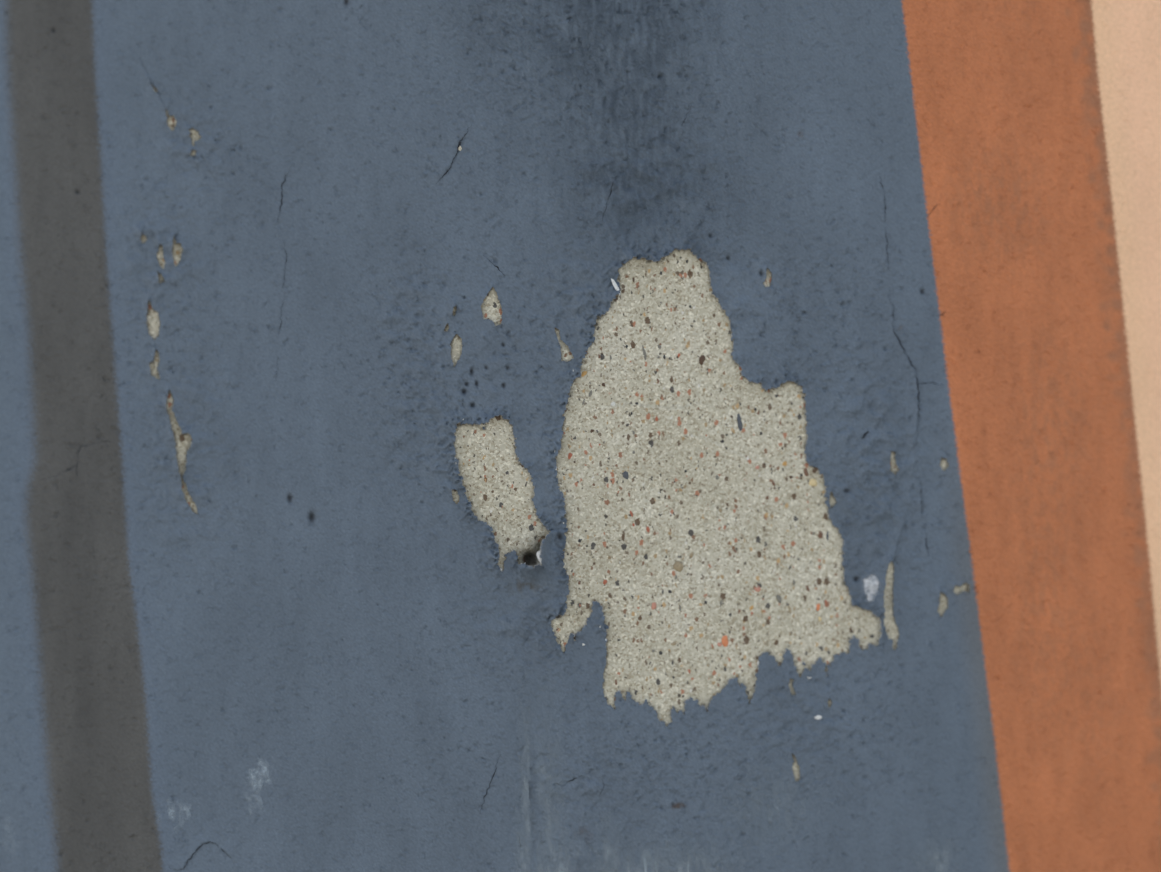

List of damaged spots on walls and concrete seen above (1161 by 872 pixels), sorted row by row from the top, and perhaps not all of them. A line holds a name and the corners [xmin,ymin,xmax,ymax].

peeling [140,232,183,284]
peeling [146,299,198,515]
peeling [444,306,463,367]
peeling [451,248,900,729]
crack [879,176,943,446]